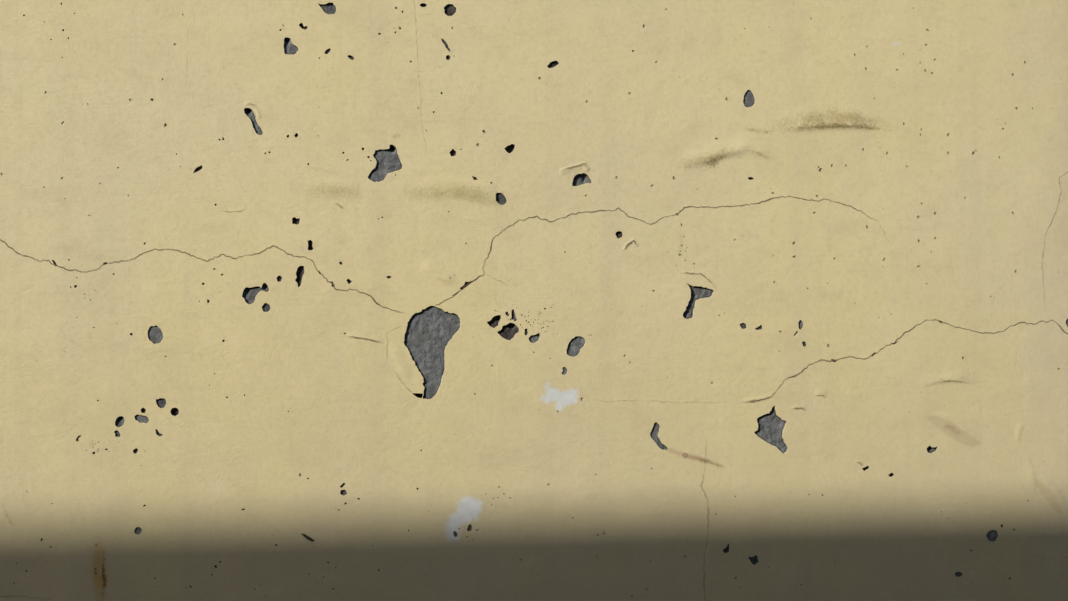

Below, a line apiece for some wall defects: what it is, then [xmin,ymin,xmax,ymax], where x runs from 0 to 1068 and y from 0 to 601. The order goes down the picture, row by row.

spalling [362,144,403,182]
crack [0,239,397,312]
crack [436,196,869,305]
spalling [683,283,714,319]
spalling [404,306,461,400]
crack [780,320,1068,387]
spalling [650,422,668,450]
spalling [754,406,788,454]